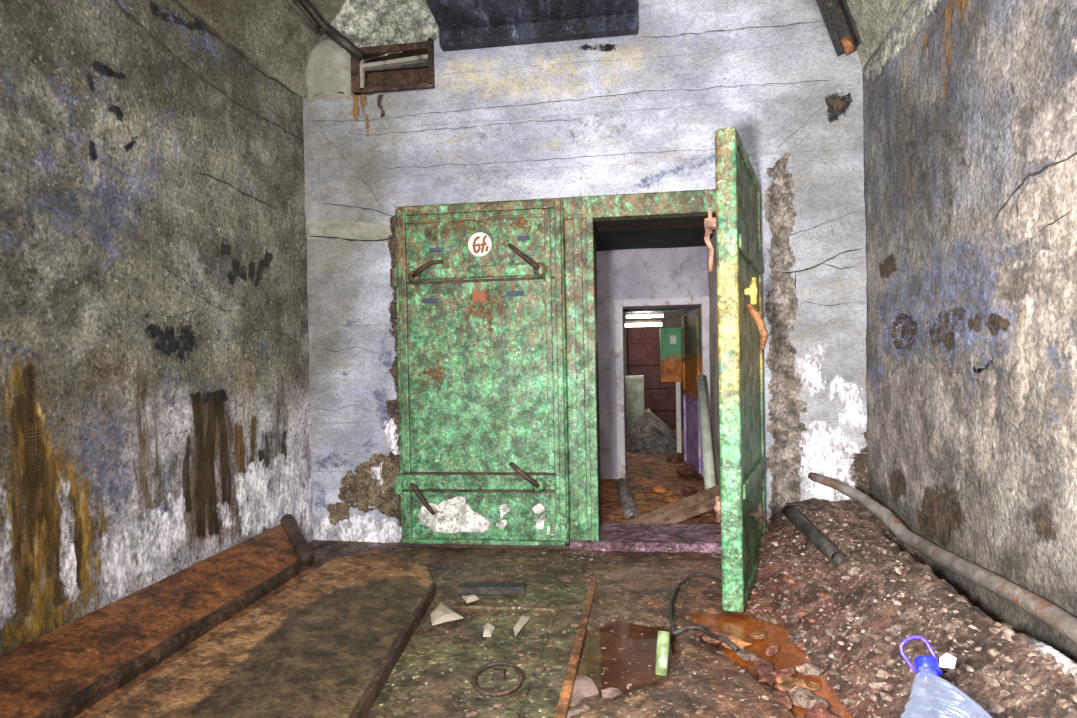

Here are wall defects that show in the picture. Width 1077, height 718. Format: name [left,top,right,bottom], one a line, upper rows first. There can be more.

corrosion [940,0,967,98]
corrosion [351,94,385,134]
crack [990,148,1077,232]
spalling [388,215,396,268]
spalling [314,287,402,538]
corrosion [415,353,452,393]
corrosion [458,288,506,345]
spalling [764,153,808,516]
efflorescence [797,344,867,501]
peeling [869,72,1077,516]
corrosion [0,358,113,651]